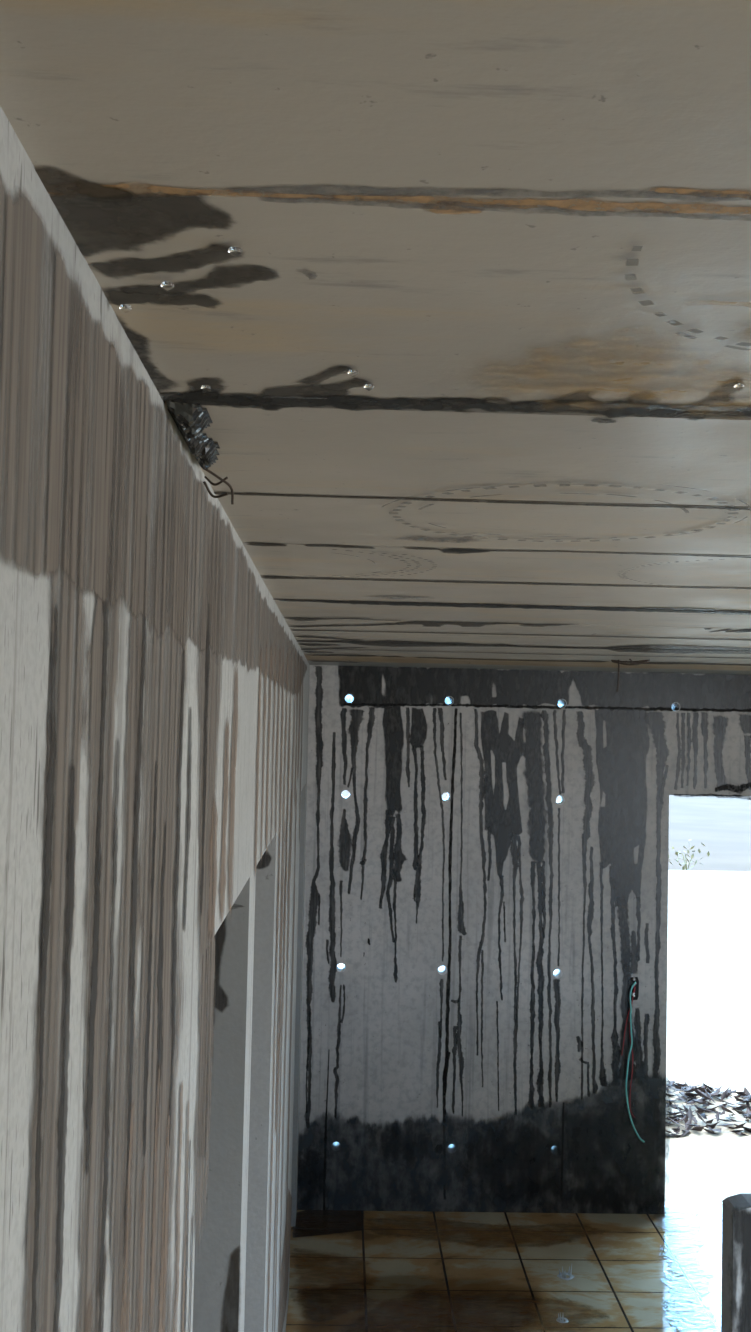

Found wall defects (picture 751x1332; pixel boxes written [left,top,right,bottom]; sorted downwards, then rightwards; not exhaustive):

rust [34,168,751,214]
damp [116,316,751,423]
damp [285,617,575,628]
damp [526,645,751,654]
damp [297,666,751,1214]